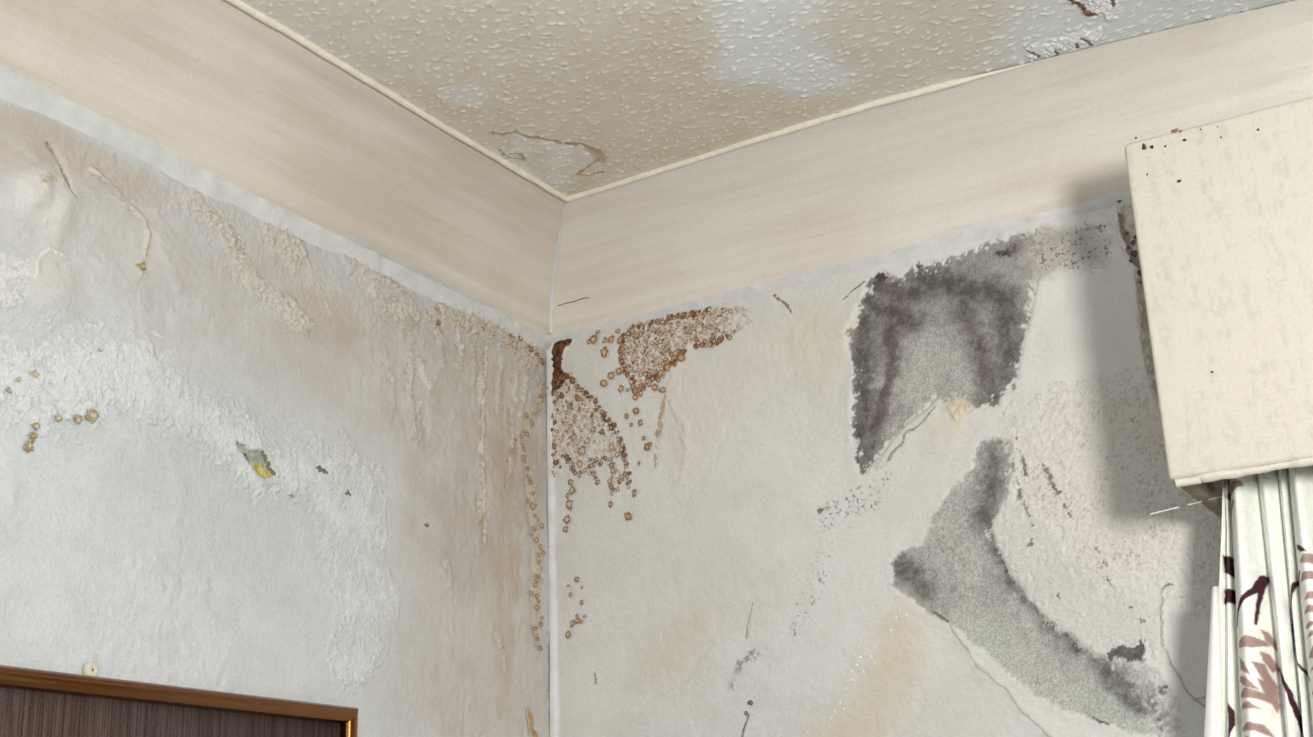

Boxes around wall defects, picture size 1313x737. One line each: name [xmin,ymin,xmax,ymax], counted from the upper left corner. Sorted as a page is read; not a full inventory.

water stain [240,0,1041,196]
peeling [1022,0,1133,63]
water stain [0,98,863,737]